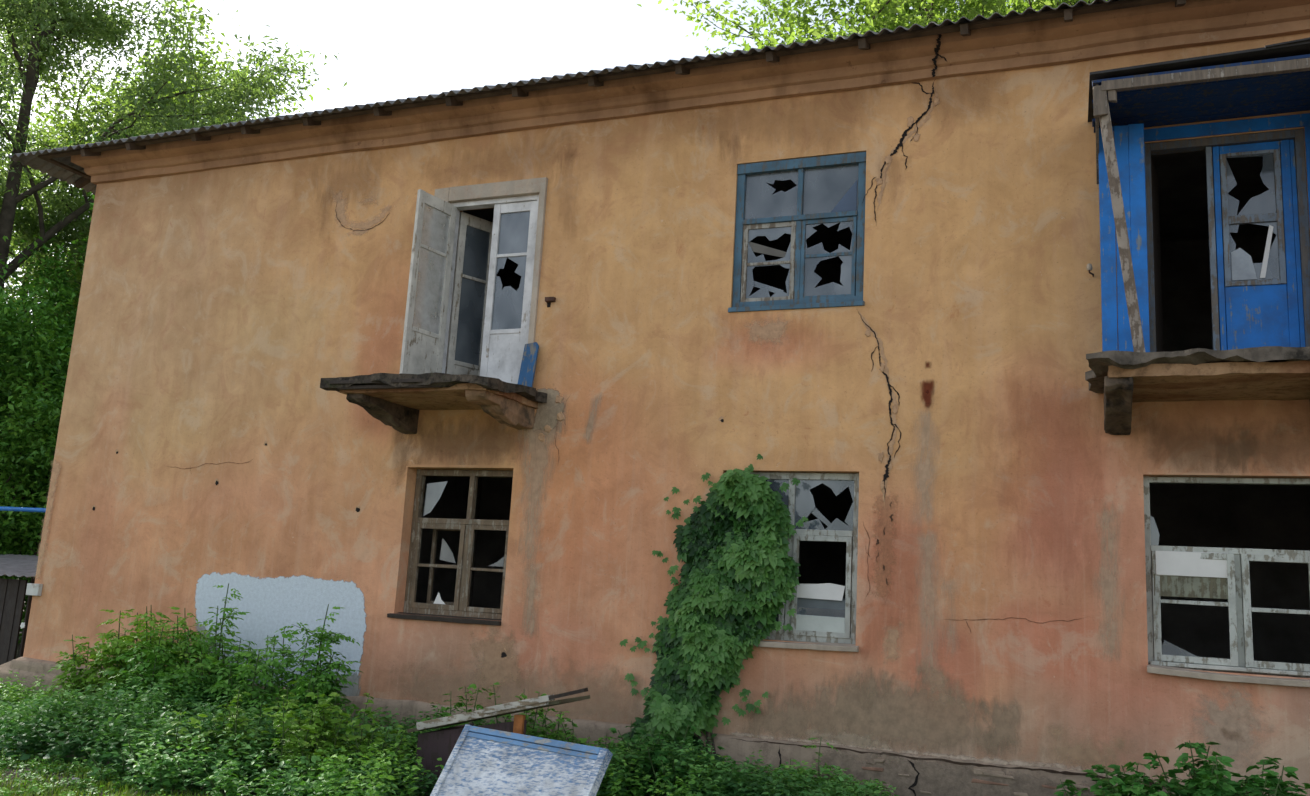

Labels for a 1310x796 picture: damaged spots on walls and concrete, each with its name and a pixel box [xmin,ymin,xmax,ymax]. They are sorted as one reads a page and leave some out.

crack [862,34,947,223]
crack [858,311,901,595]
corrosion [922,363,934,407]
crack [944,616,1089,632]